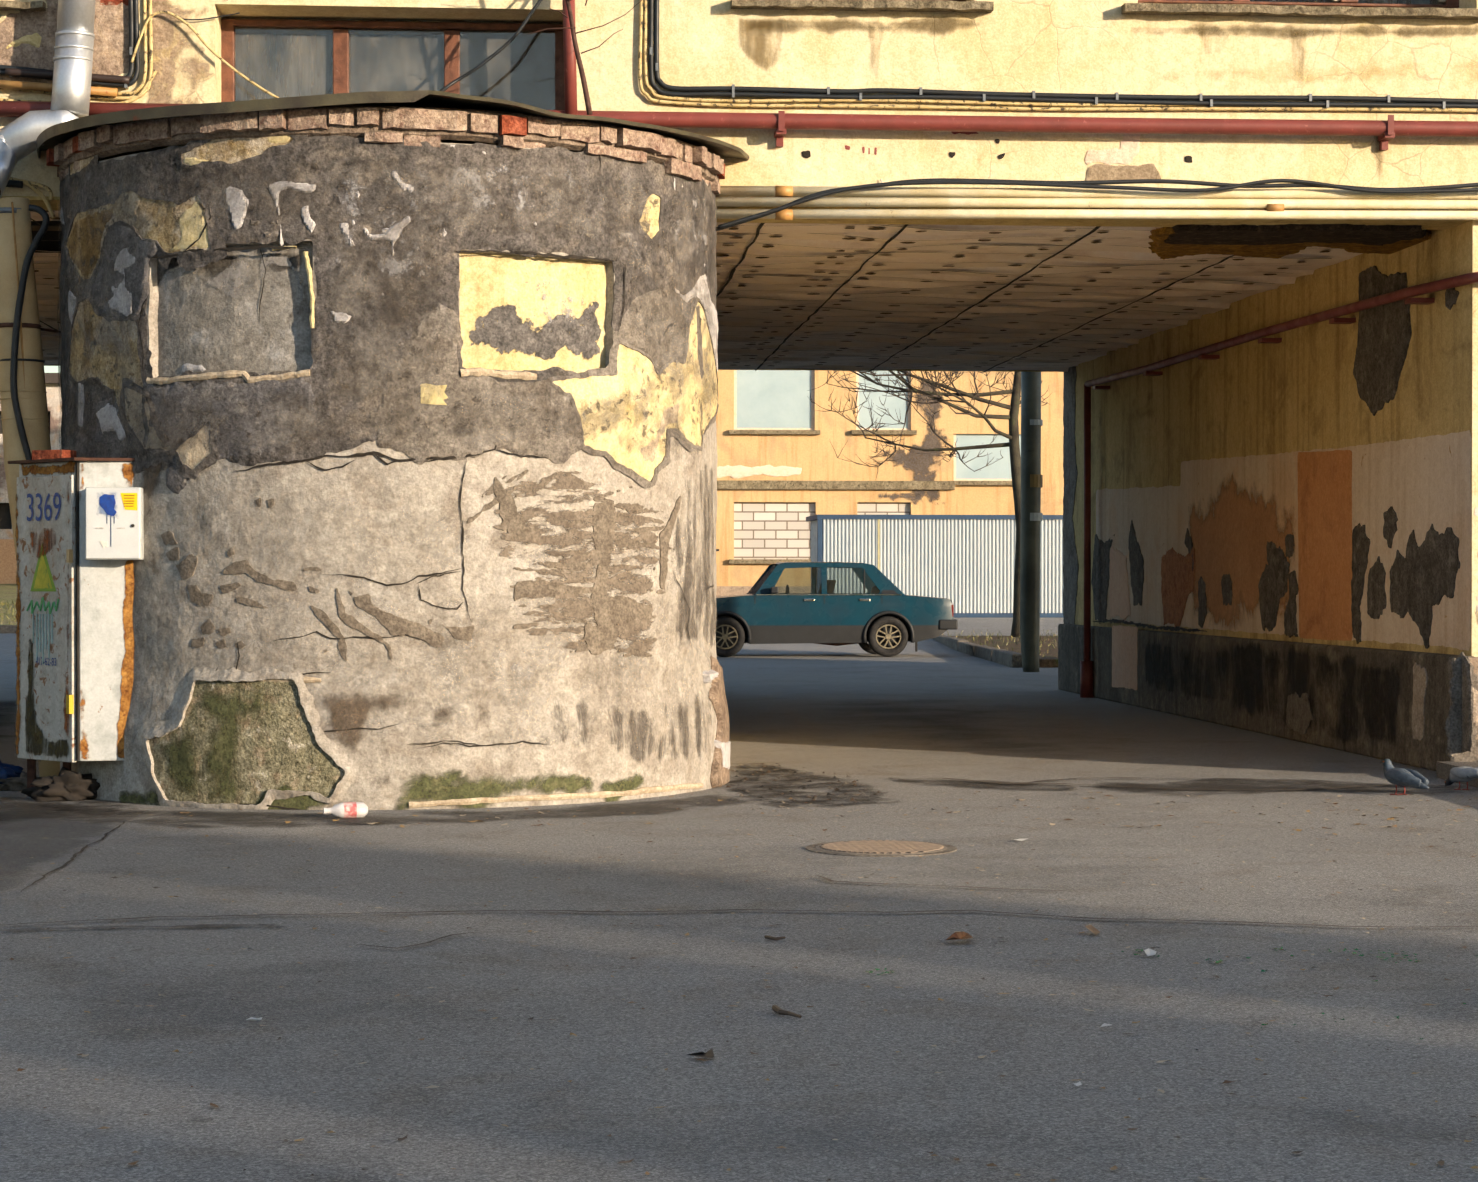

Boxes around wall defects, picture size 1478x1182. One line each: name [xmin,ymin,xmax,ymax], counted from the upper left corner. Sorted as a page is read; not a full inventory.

peeling [0,0,58,100]
peeling [90,0,209,104]
peeling [63,135,308,480]
peeling [1353,266,1412,416]
spalling [134,531,363,810]
crack [274,631,427,675]
crack [238,444,547,620]
crack [324,724,541,749]
water stain [559,703,587,741]
water stain [461,465,717,657]
water stain [609,692,712,761]
peeling [1351,506,1460,741]